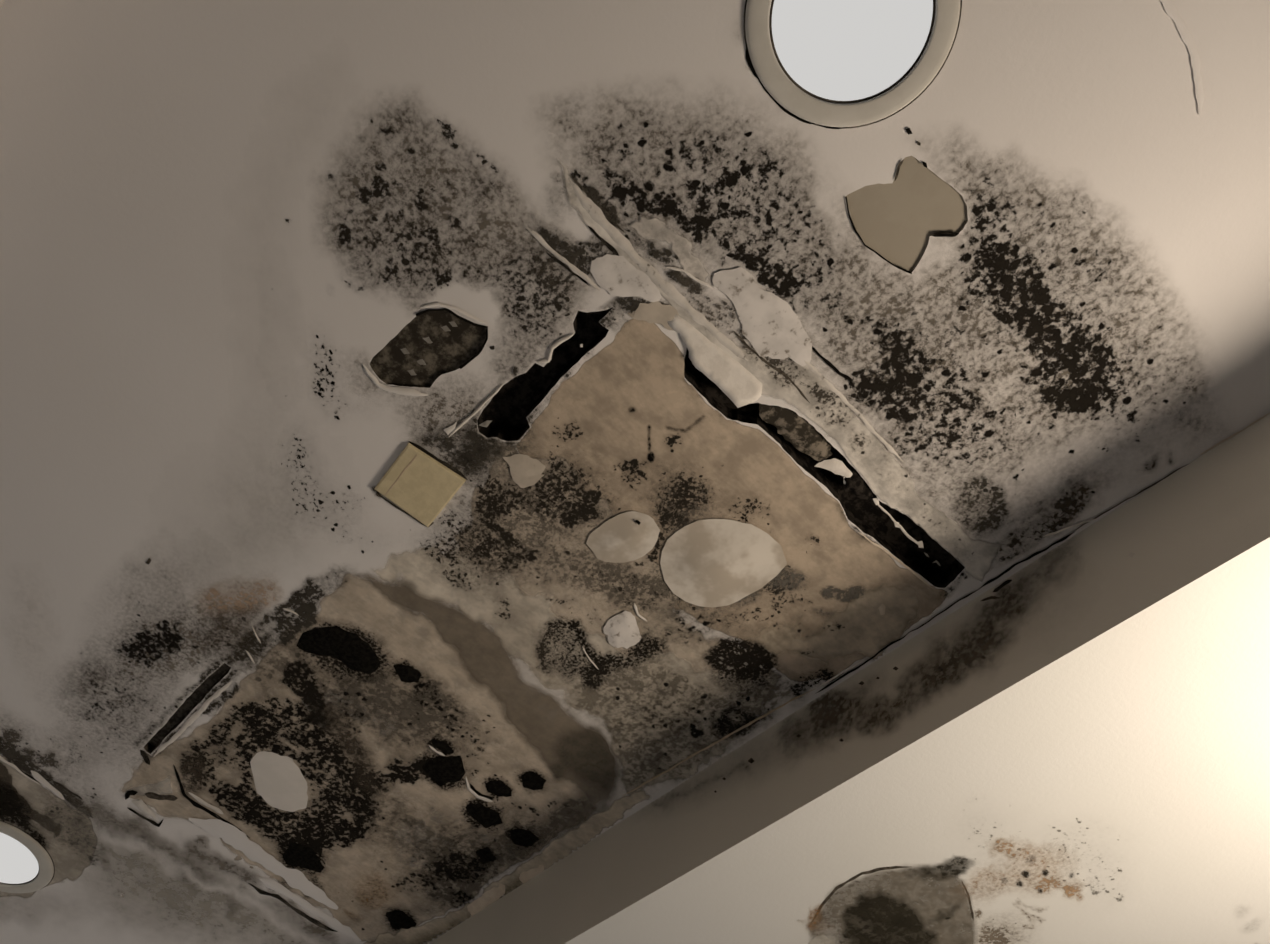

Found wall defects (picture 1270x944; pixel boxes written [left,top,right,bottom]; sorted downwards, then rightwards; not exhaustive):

mould [312,335,346,420]
mould [328,109,576,361]
leakage [746,44,847,129]
mould [559,99,1204,563]
peeling [845,128,968,274]
leakage [0,388,1052,944]
spalling [122,217,947,943]
spalling [0,756,97,898]